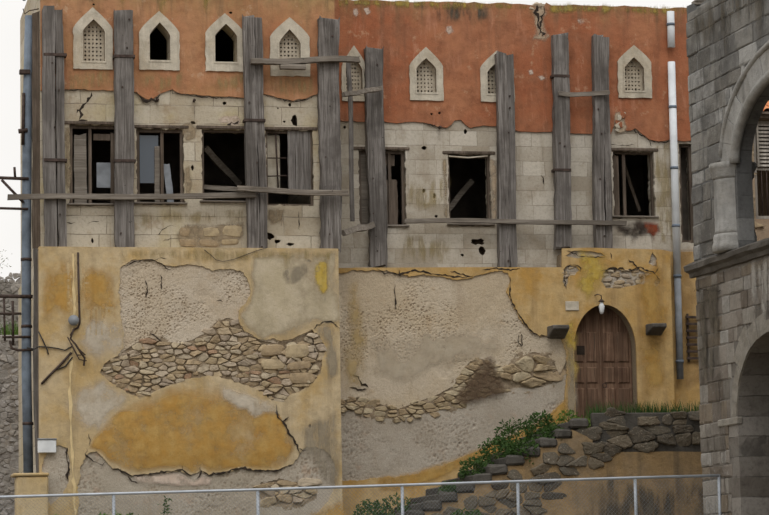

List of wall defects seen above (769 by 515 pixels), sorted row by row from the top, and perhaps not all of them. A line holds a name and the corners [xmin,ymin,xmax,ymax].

crack [55,89,93,121]
flaking render [562,251,604,287]
flaking render [601,253,660,288]
flaking render [42,260,567,515]
crack [65,405,305,483]